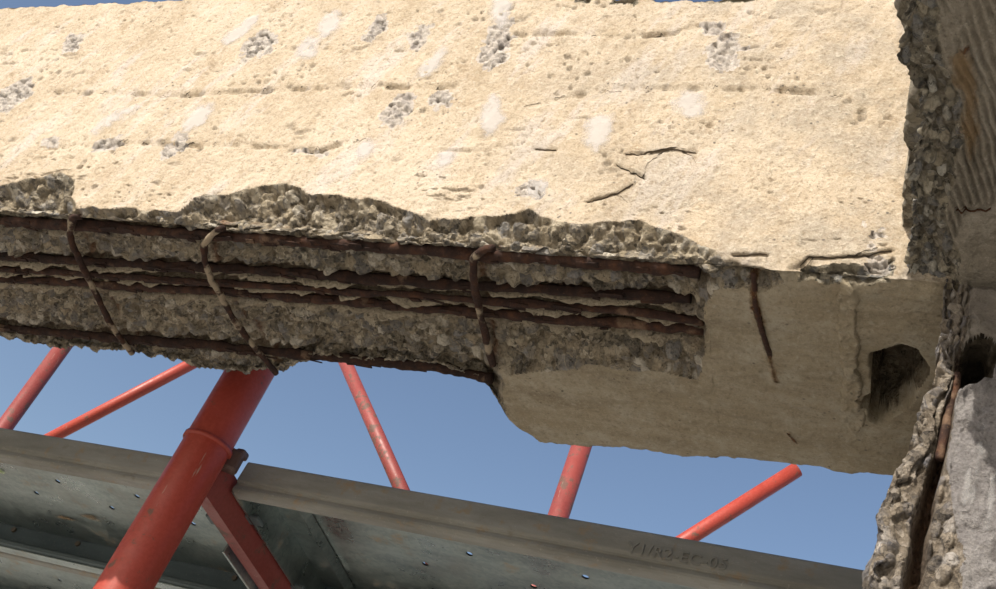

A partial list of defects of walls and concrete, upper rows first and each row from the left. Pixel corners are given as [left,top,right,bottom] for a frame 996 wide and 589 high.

crack [587,147,696,203]
spalling [0,172,784,417]
rust [750,268,779,383]
crack [800,247,892,269]
spalling [798,0,996,589]